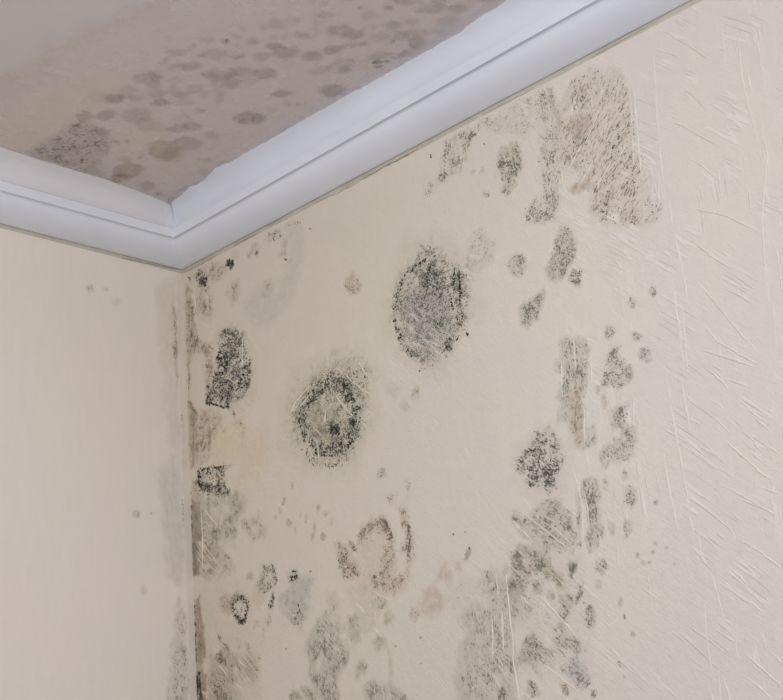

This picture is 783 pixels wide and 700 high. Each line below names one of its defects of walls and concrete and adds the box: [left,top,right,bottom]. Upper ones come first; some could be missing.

water stain [438,118,502,182]
water stain [497,146,521,194]
water stain [525,71,662,225]
water stain [392,244,470,372]
water stain [173,259,264,575]
water stain [290,358,372,469]
water stain [558,341,595,450]
water stain [603,348,631,387]
water stain [338,509,415,590]
water stain [455,431,630,700]
water stain [194,595,260,700]
water stain [290,597,349,700]